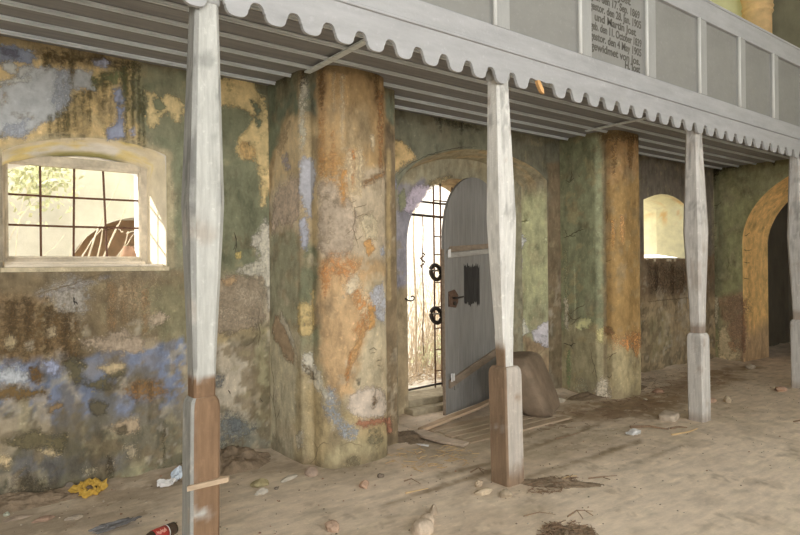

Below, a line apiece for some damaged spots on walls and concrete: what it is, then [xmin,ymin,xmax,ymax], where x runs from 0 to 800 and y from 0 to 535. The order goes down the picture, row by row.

flaking render [0,43,109,138]
water stain [37,49,145,144]
spalling [107,87,136,141]
peeling [221,78,378,258]
water stain [0,298,84,362]
flaking render [0,327,145,416]
flaking render [218,273,392,440]
rust [345,290,376,380]
peeling [522,319,549,348]